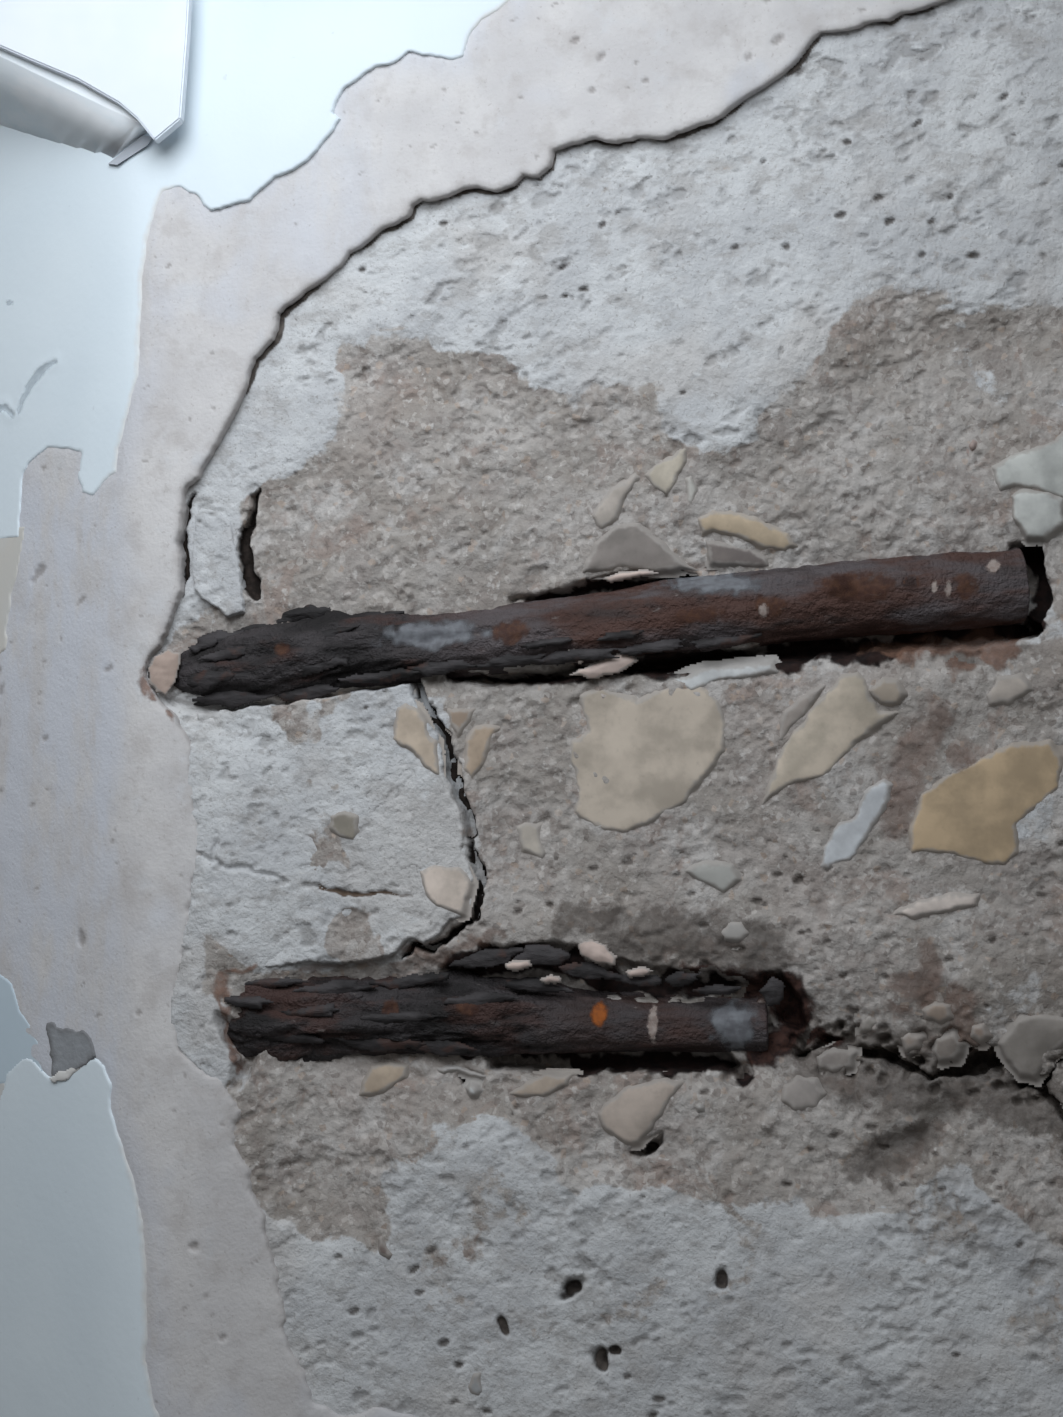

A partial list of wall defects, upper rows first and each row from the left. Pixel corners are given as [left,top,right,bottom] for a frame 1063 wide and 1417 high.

spalling [149,0,1063,667]
peeling [0,527,25,654]
crack [183,494,196,584]
crack [239,489,261,601]
rust [446,545,1053,685]
rust [140,677,172,717]
crack [402,689,487,959]
flaking render [46,1022,96,1076]
rust [215,965,256,1071]
spalling [147,530,1063,1417]
rust [440,941,844,1087]
crack [798,1037,1063,1120]